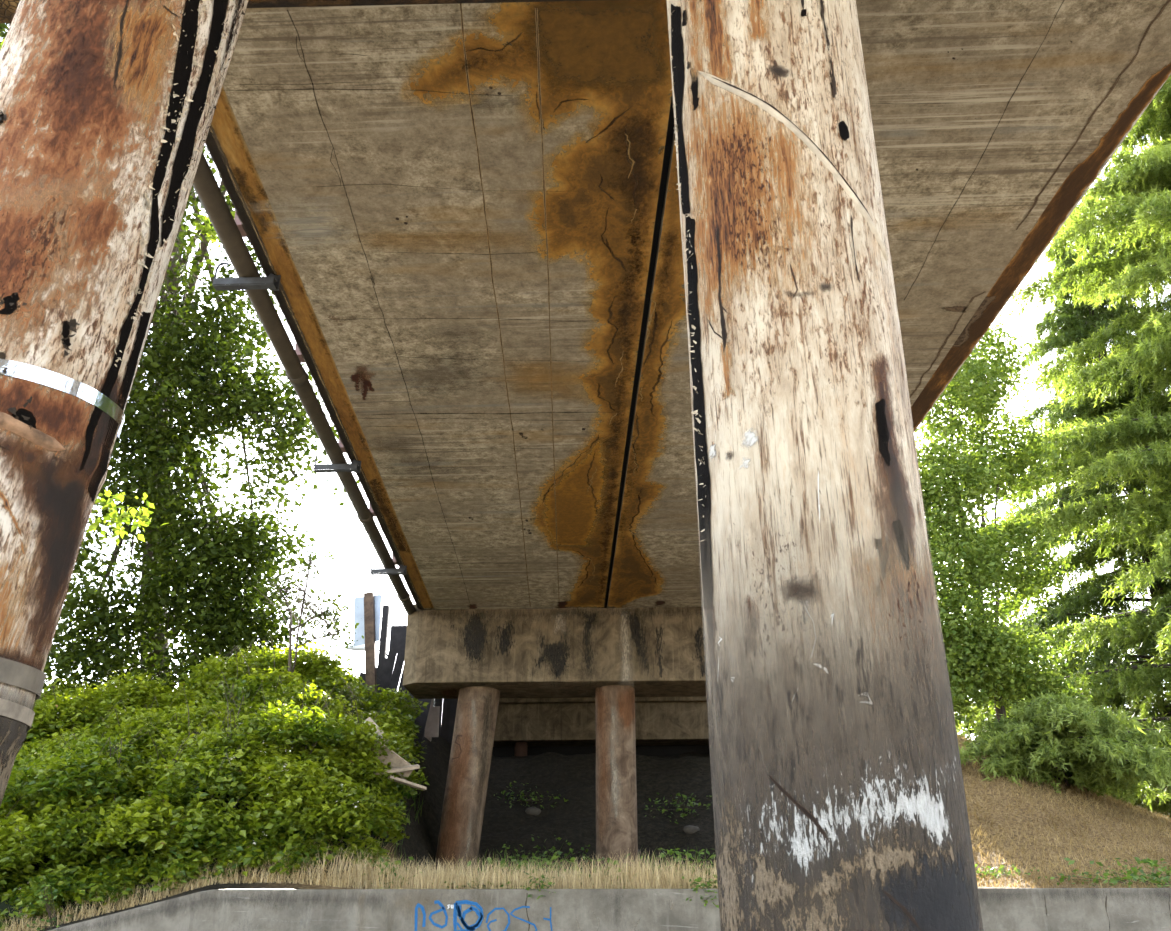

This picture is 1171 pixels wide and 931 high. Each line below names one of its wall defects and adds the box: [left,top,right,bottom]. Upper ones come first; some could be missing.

corrosion [0,0,262,671]
corrosion [350,366,375,400]
damp [205,0,705,680]
corrosion [674,0,984,931]